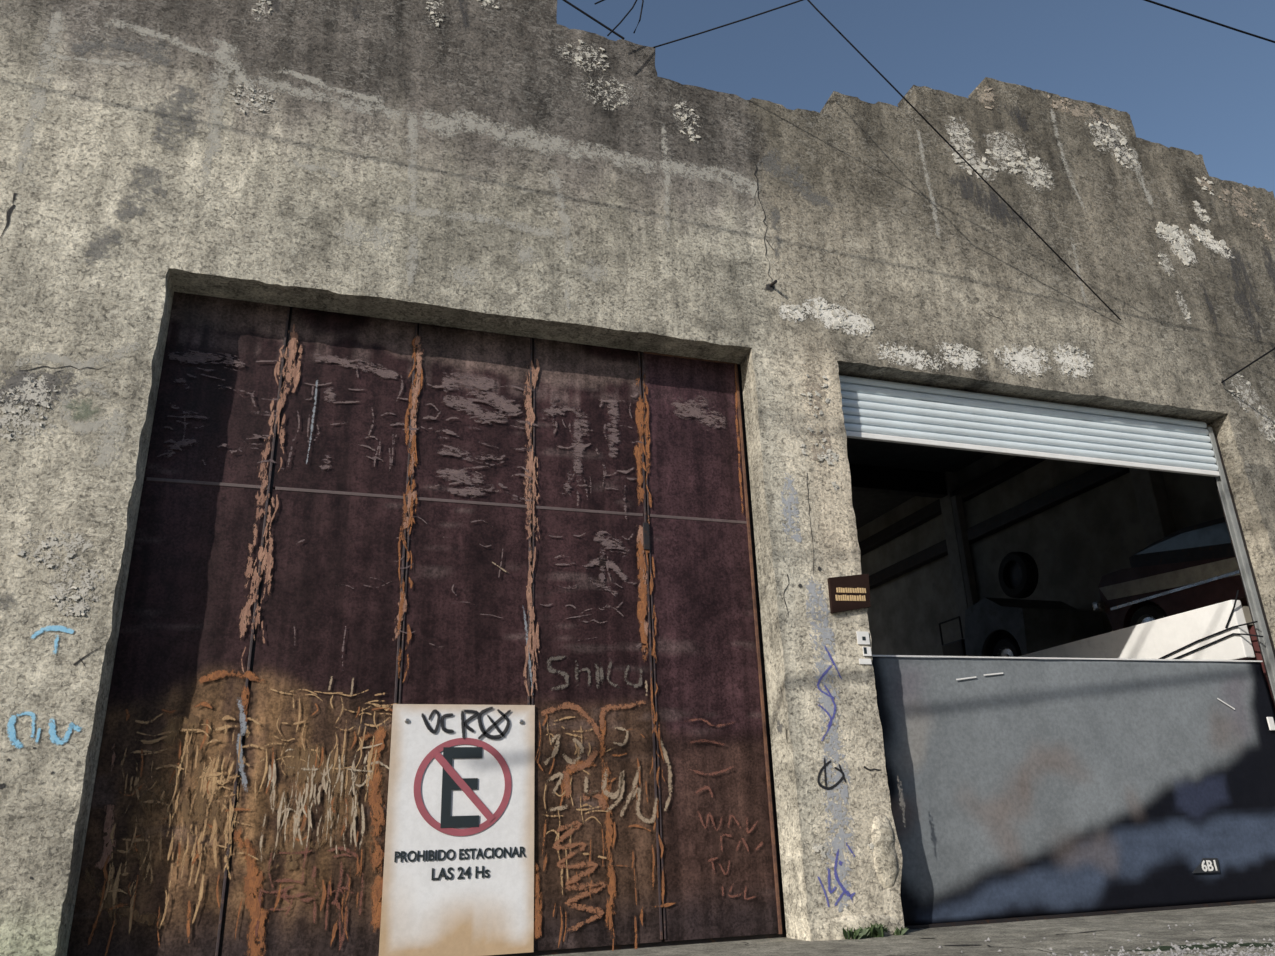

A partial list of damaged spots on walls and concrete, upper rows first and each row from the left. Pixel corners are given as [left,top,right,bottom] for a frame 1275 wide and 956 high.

crack [0,193,17,238]
leakage [17,12,832,266]
leakage [917,131,940,235]
leakage [1095,113,1153,206]
rust [279,331,303,408]
rust [409,335,424,475]
rust [633,396,651,504]
rust [239,439,274,638]
rust [402,490,417,529]
rust [392,591,407,640]
rust [636,525,649,661]